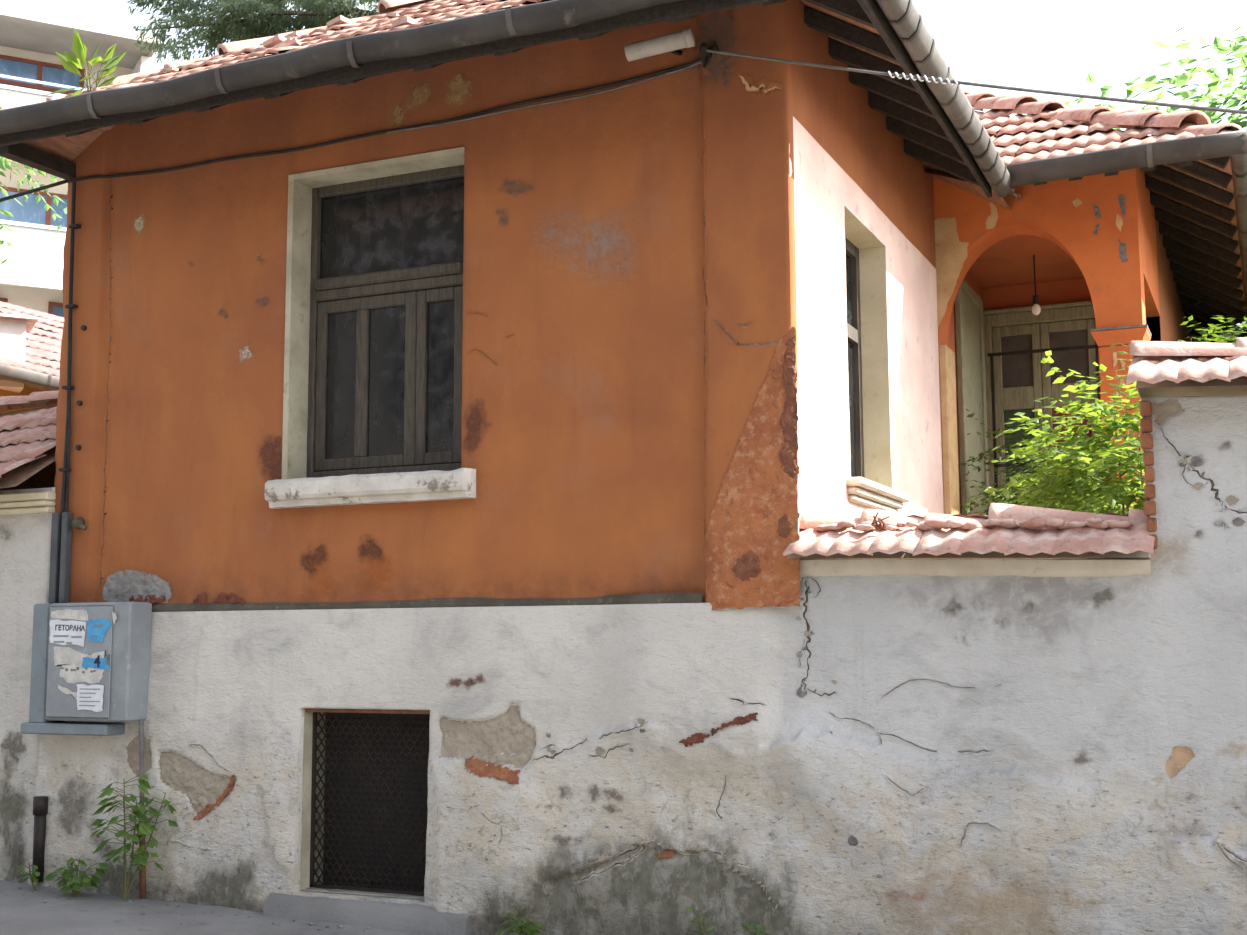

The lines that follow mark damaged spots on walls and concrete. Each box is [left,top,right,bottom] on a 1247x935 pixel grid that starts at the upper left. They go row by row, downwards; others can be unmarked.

peeling [934,217,969,327]
spalling [705,327,801,610]
crack [1152,415,1247,530]
rust [302,545,325,573]
rust [360,540,382,560]
crack [729,576,1001,757]
damp [0,733,25,883]
spalling [126,735,235,821]
peeling [439,703,536,784]
crack [531,718,649,764]
damp [590,786,622,812]
damp [479,838,800,935]